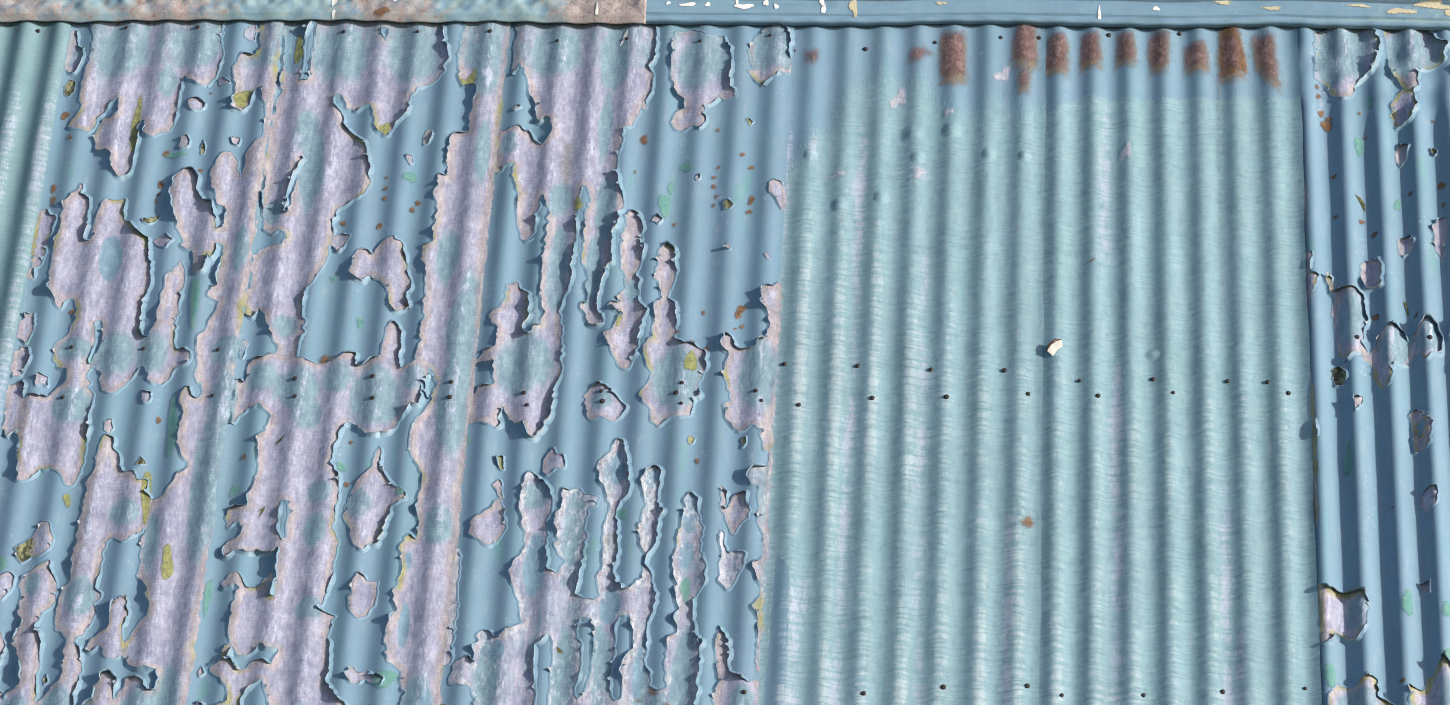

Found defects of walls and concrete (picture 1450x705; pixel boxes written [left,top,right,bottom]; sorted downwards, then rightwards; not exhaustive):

rust [911,32,966,85]
rust [1012,24,1278,92]
peeling [1311,26,1450,169]
peeling [1304,179,1450,412]
peeling [0,19,795,705]
peeling [1310,375,1320,528]
peeling [1406,408,1434,457]
peeling [1418,484,1440,514]
peeling [1317,583,1374,647]
peeling [1416,578,1433,596]
peeling [1326,650,1450,705]